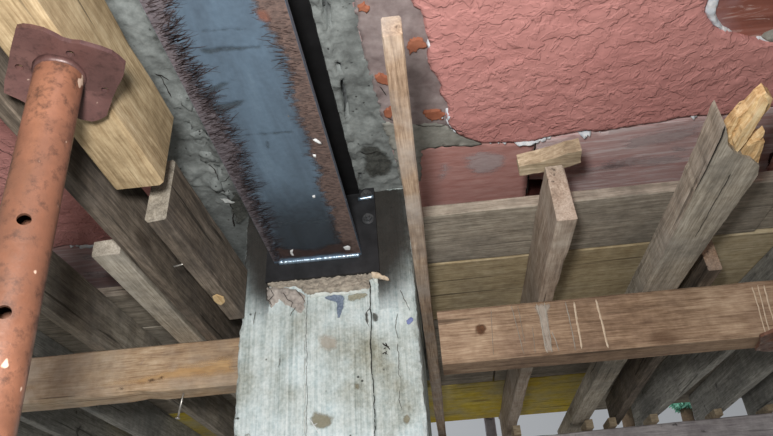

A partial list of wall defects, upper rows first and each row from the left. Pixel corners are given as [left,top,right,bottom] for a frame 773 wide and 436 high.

flaking render [705,0,773,42]
rust [139,0,361,262]
damp [362,146,392,177]
flaking render [354,0,707,207]
flaking render [756,106,773,172]
spalling [267,272,389,313]
crack [366,281,376,436]